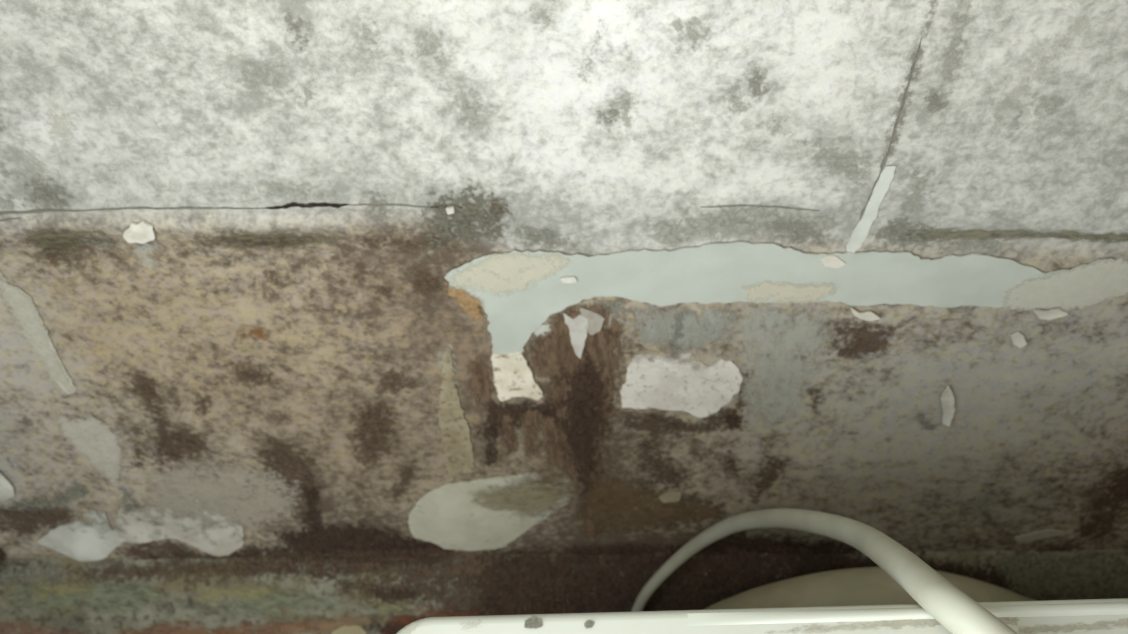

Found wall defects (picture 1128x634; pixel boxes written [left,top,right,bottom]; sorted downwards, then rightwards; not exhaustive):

crack [859,1,974,221]
crack [0,203,462,222]
water stain [204,230,347,250]
water stain [364,186,569,298]
spalling [620,352,743,418]
peeling [444,241,1128,401]
water stain [828,317,899,359]
peeling [0,473,15,501]
peeling [50,408,123,483]
peeling [38,462,302,561]
water stain [0,298,879,634]
water stain [919,469,1128,601]